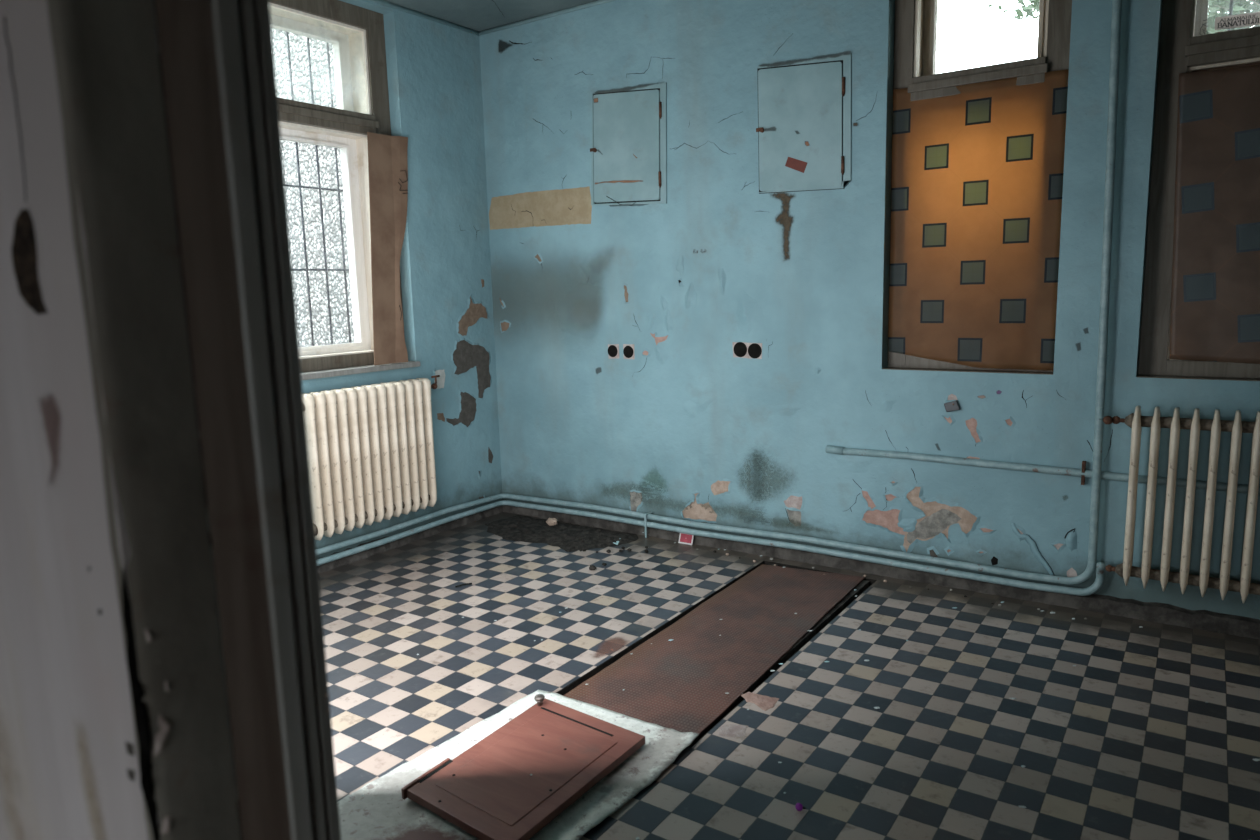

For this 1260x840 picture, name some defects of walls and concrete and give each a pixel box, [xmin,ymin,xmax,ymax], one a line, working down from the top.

rust [772,192,794,260]
peeling [432,279,511,429]
peeling [860,478,996,558]
flaking render [125,741,135,782]
flaking render [154,714,171,756]
flaking render [161,816,171,834]